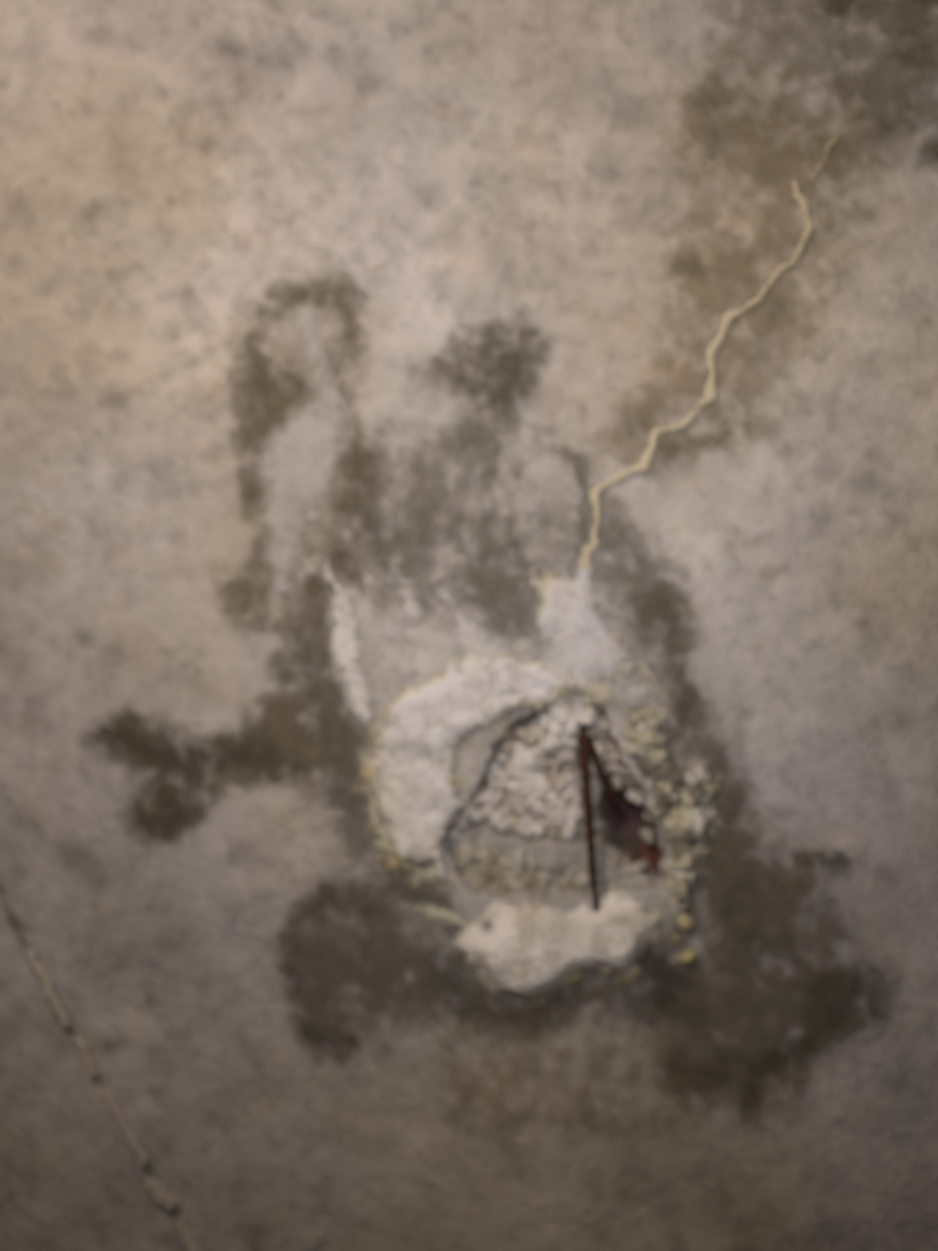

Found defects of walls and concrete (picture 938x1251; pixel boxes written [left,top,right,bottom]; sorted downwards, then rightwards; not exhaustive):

leakage [239,335,304,454]
leakage [267,282,358,354]
leakage [434,324,543,423]
crack [581,133,837,570]
leakage [336,428,378,529]
leakage [100,517,881,1106]
spalling [442,690,664,907]
rust [601,781,665,874]